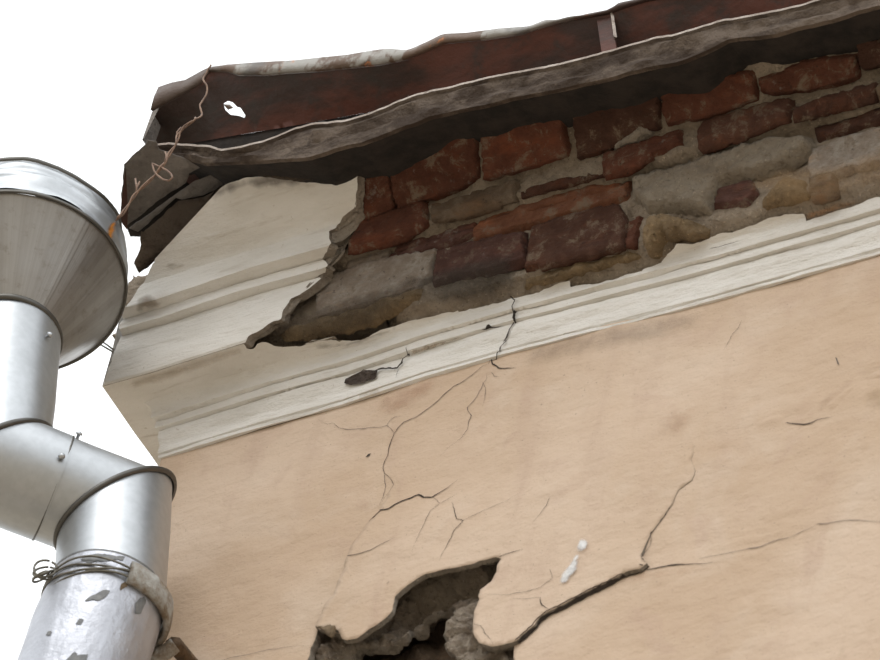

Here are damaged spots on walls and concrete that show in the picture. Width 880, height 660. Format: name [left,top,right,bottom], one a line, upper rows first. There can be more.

spalling [250,40,880,349]
spalling [125,274,148,306]
crack [320,296,517,558]
spalling [315,563,514,660]
crack [496,495,880,644]